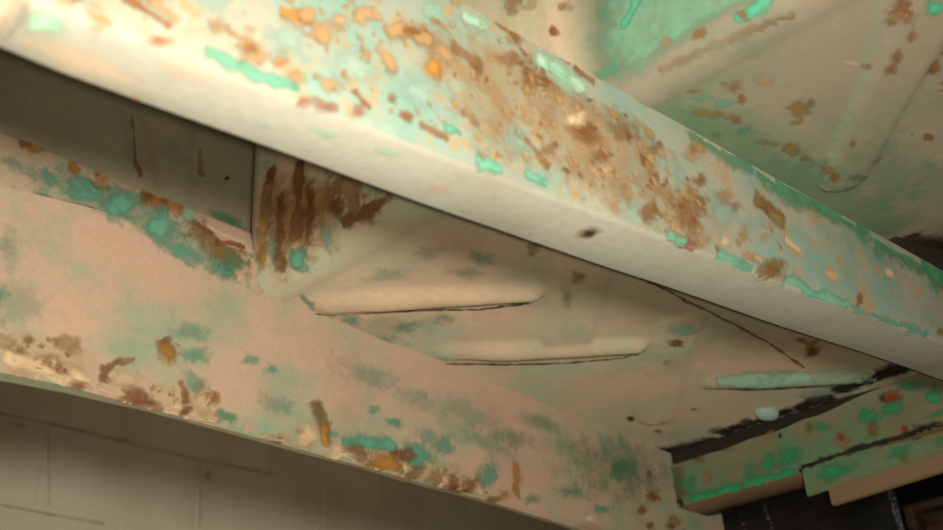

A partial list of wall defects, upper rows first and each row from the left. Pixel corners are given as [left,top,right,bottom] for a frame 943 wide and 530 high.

peeling [206,47,299,90]
peeling [536,53,586,93]
peeling [601,0,771,77]
rust [280,0,783,281]
rust [141,159,392,271]
rust [754,192,800,253]
crack [640,278,841,391]
rust [0,336,219,423]
peeling [716,371,872,389]
rust [243,402,520,503]
peeling [687,448,799,502]
damp [799,422,943,473]